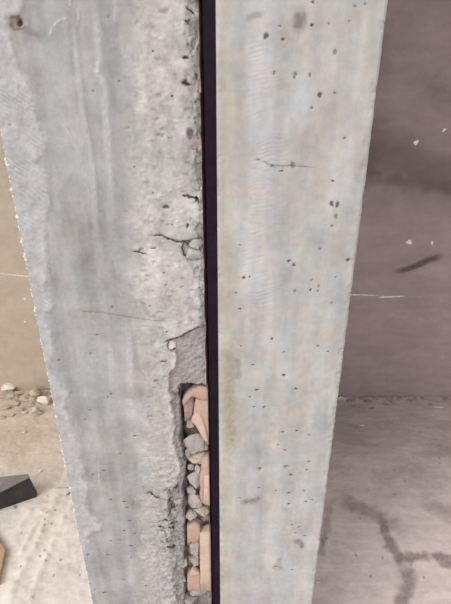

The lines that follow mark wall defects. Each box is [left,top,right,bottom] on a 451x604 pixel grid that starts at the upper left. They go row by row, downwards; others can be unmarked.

crack [133,234,190,256]
crack [146,382,190,555]
peeling [137,325,212,604]